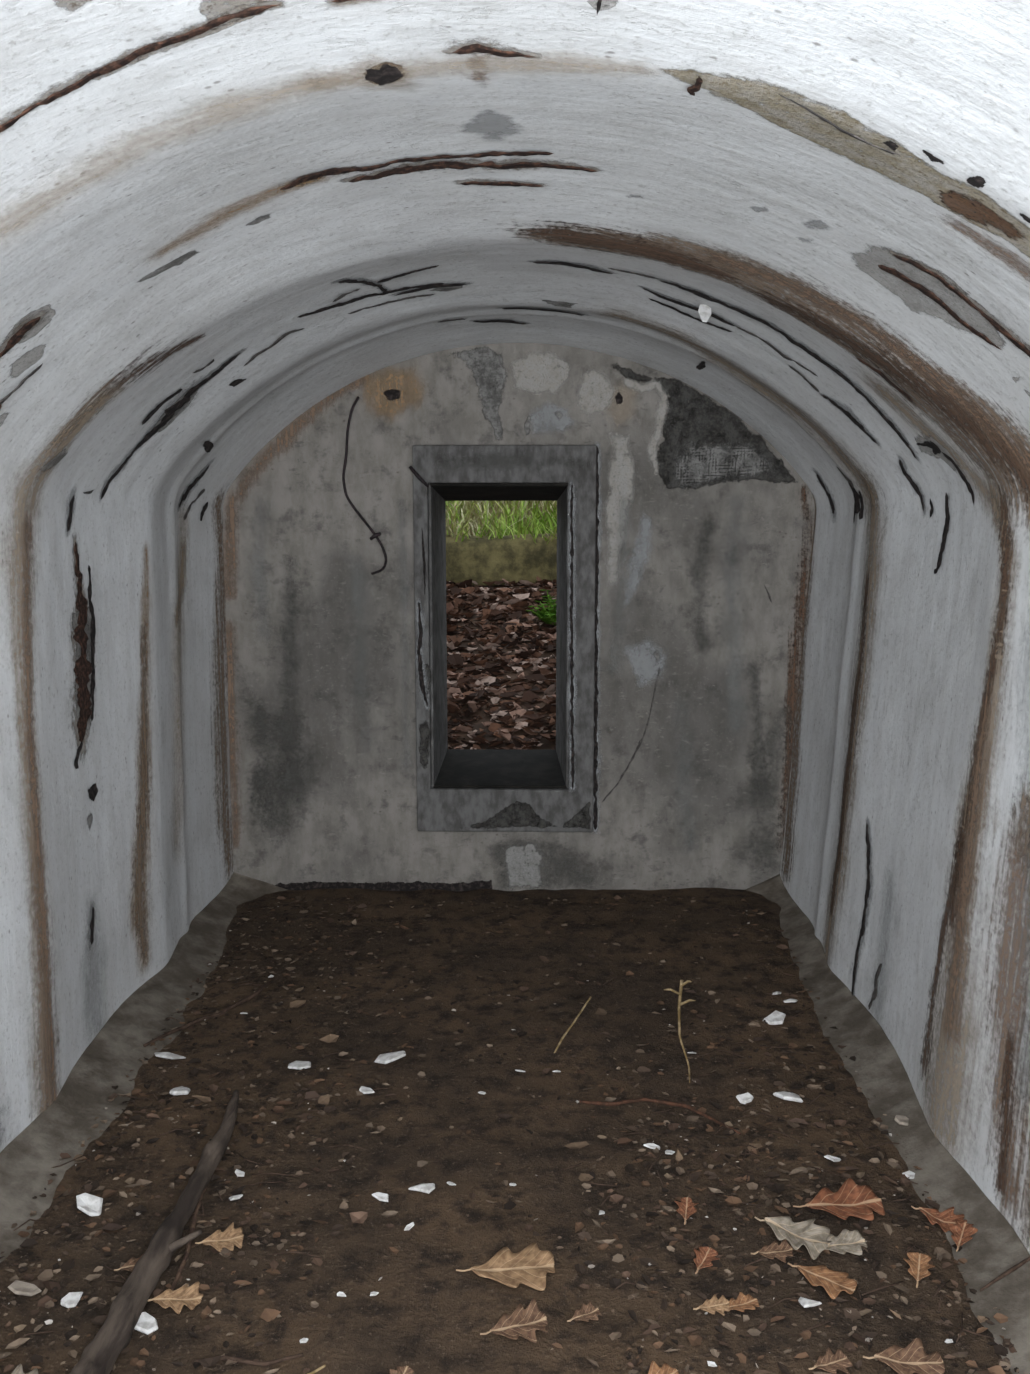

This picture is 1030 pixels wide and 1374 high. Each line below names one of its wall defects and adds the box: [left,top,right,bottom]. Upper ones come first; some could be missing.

spalling [55,0,92,11]
crack [0,0,283,133]
spalling [199,0,280,20]
crack [327,0,361,8]
spalling [312,62,405,87]
spalling [661,69,1030,279]
crack [66,265,584,536]
spalling [452,346,795,603]
crack [531,260,975,574]
corrosion [9,334,206,1114]
corrosion [516,220,1030,1245]
crack [851,820,882,1009]